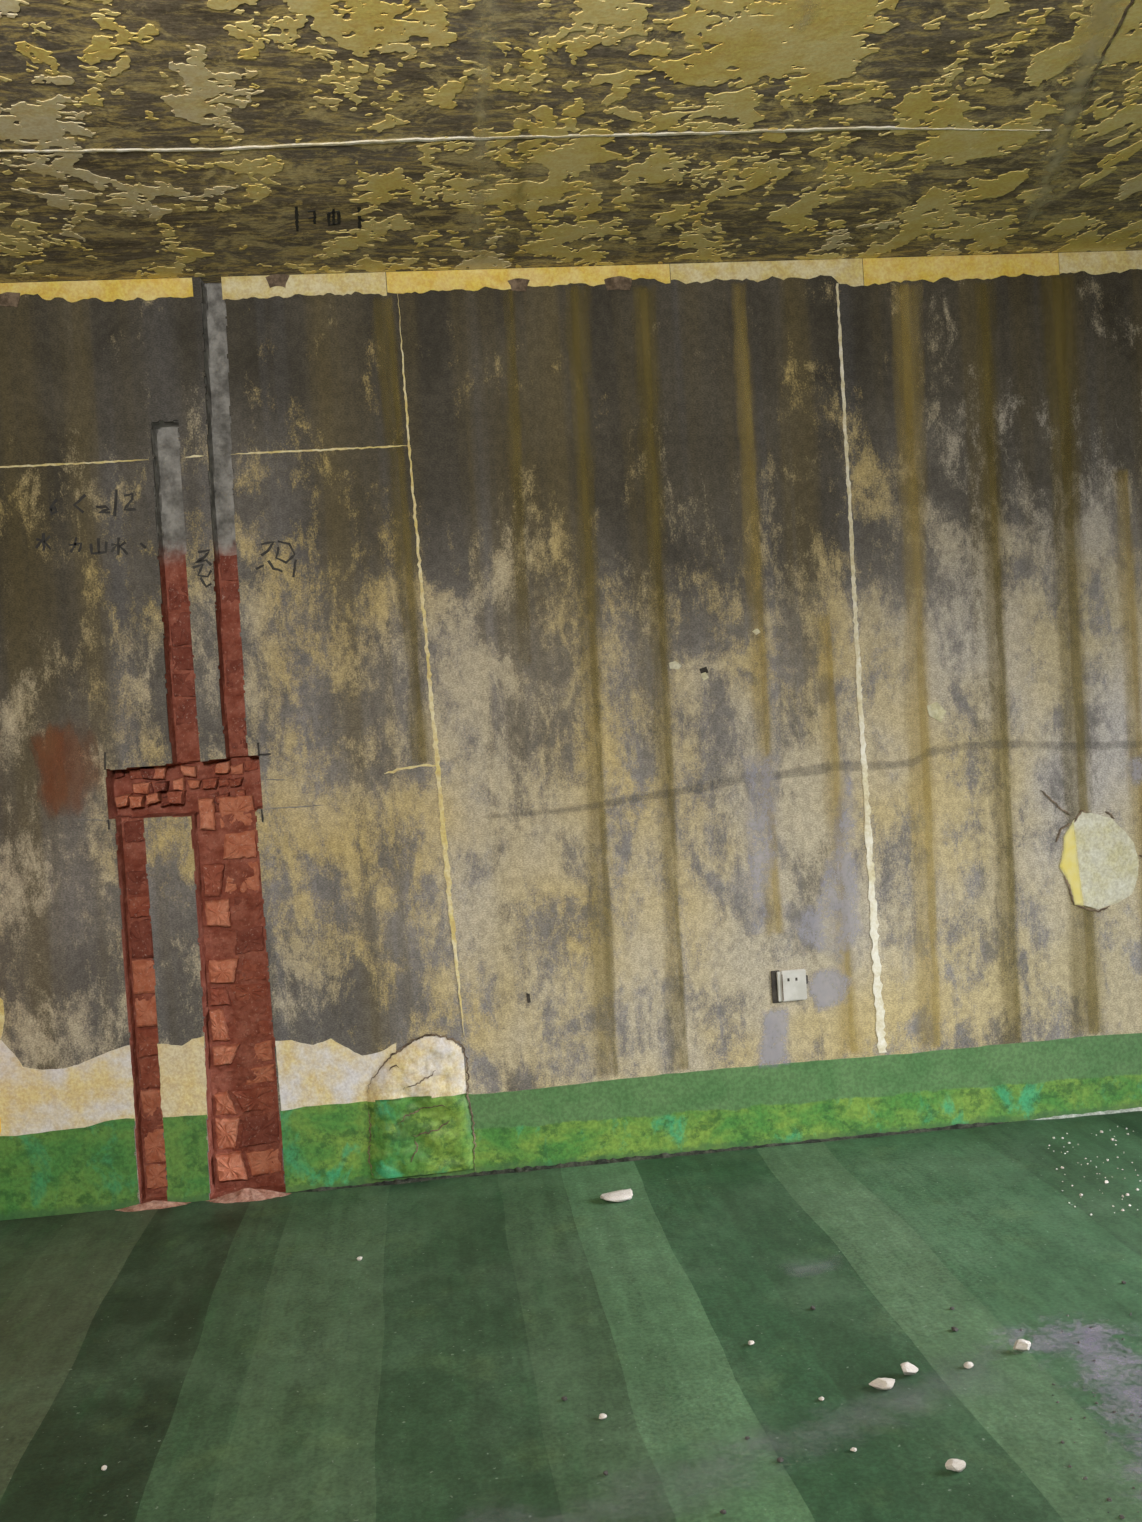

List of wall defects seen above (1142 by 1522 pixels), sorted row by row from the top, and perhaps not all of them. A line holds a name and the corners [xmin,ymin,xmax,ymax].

crack [0,0,1135,222]
peeling [0,0,1142,307]
flaking render [669,661,709,681]
flaking render [927,702,946,722]
flaking render [1041,790,1142,912]
peeling [0,998,135,1136]
peeling [157,1036,207,1117]
peeling [275,1039,396,1111]